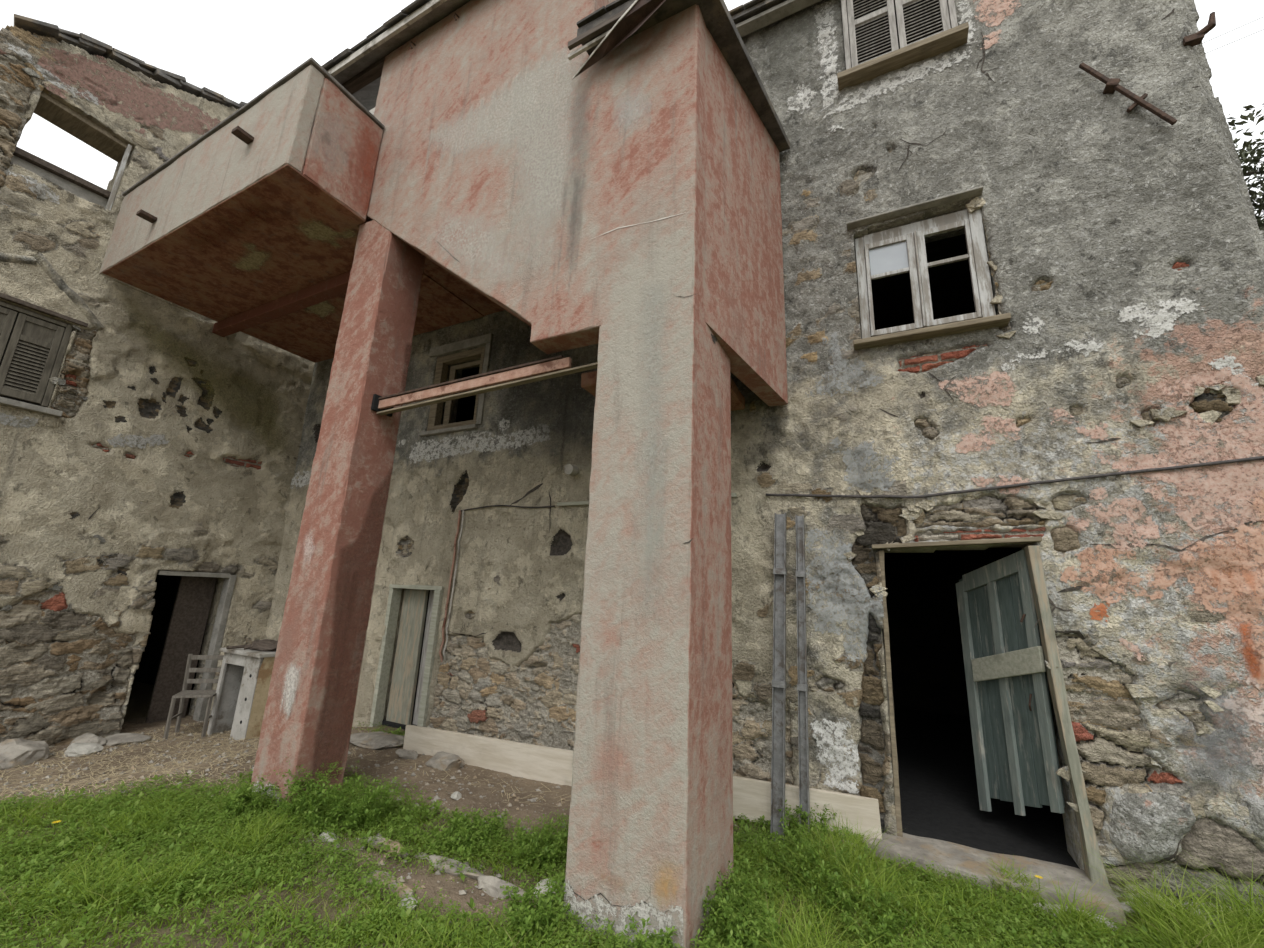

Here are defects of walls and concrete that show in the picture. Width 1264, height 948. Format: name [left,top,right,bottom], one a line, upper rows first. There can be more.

peeling [787,0,1021,134]
peeling [1117,297,1204,341]
flaking render [49,325,98,418]
spalling [103,400,127,423]
spalling [127,357,222,433]
peeling [397,418,551,464]
spalling [450,470,469,514]
flaking render [805,355,1264,908]
peeling [564,880,683,948]